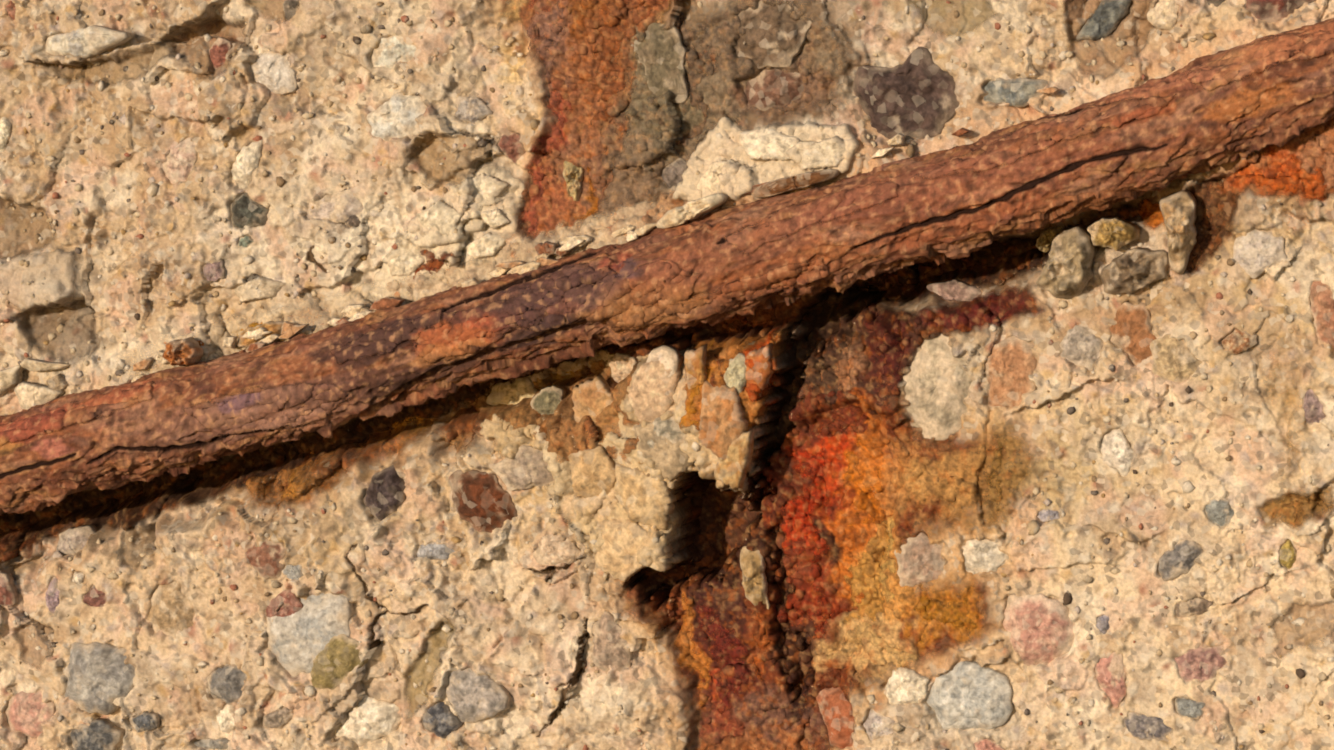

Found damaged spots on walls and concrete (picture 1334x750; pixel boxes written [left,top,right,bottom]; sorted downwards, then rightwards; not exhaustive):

rust [1185,30,1334,91]
rust [1067,199,1164,229]
rust [1185,119,1334,271]
rust [0,0,1050,750]
peeling [478,285,886,695]
rust [1261,488,1334,527]
crack [345,544,428,650]